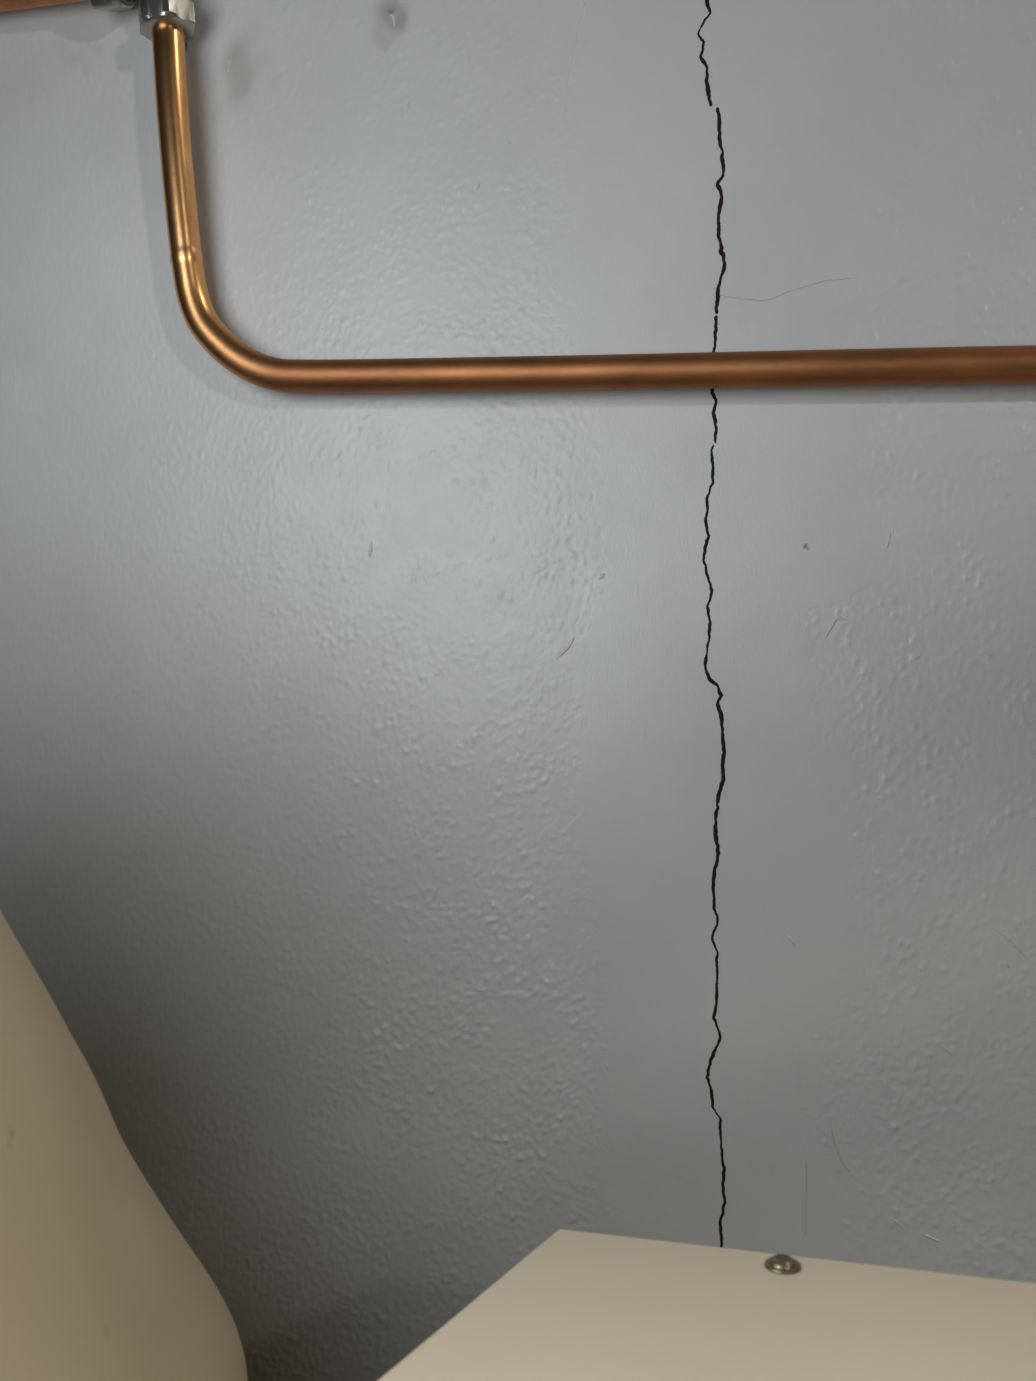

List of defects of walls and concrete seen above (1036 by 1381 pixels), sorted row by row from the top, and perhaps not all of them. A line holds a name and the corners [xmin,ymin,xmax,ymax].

crack [697,0,852,352]
crack [702,388,727,1248]